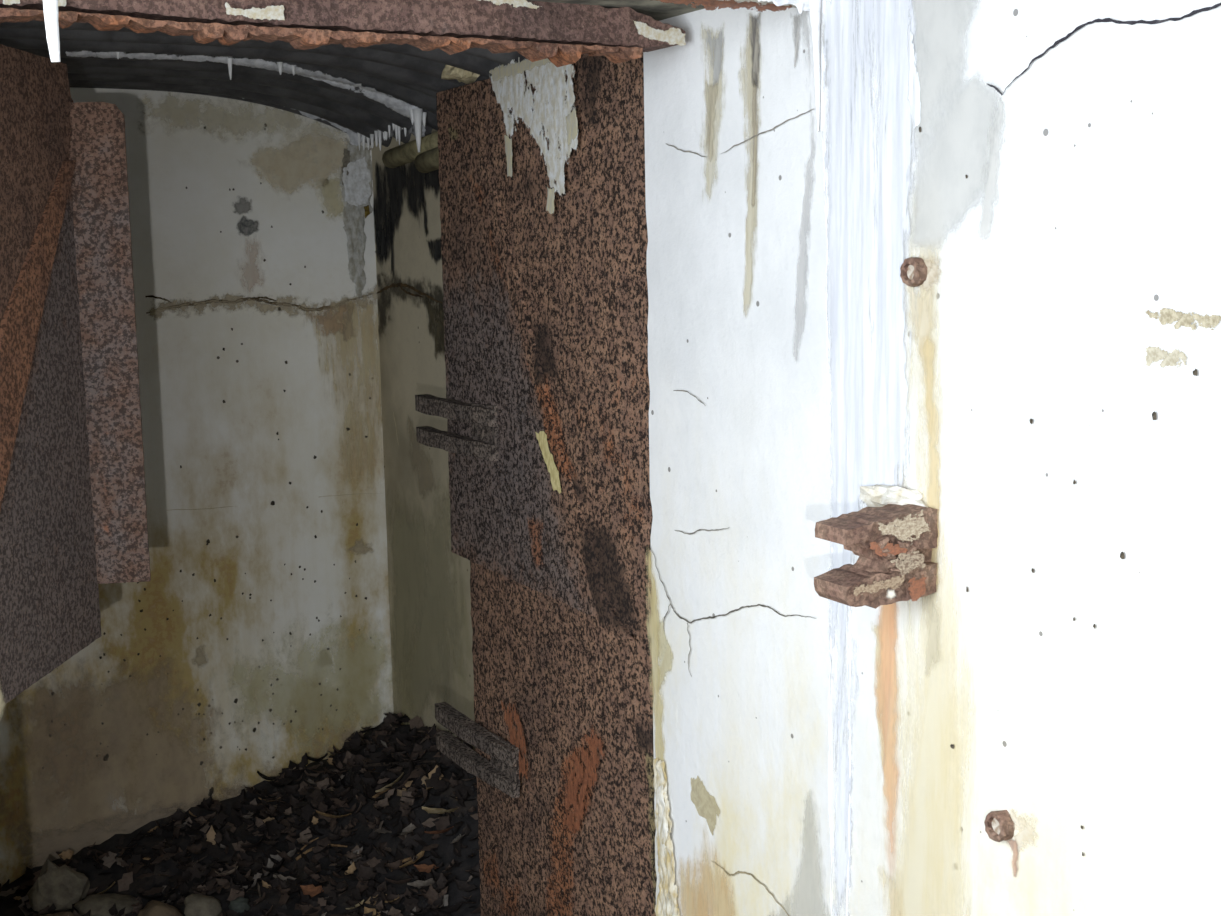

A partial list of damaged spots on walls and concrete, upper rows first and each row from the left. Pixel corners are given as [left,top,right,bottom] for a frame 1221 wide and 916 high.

crack [986,3,1221,96]
leakage [489,58,579,214]
leakage [702,30,722,197]
crack [145,275,443,333]
leakage [741,0,1004,916]
crack [675,527,728,535]
crack [649,544,816,677]
rust [870,535,927,601]
rust [501,700,530,779]
rust [561,725,605,834]
rust [876,603,897,845]